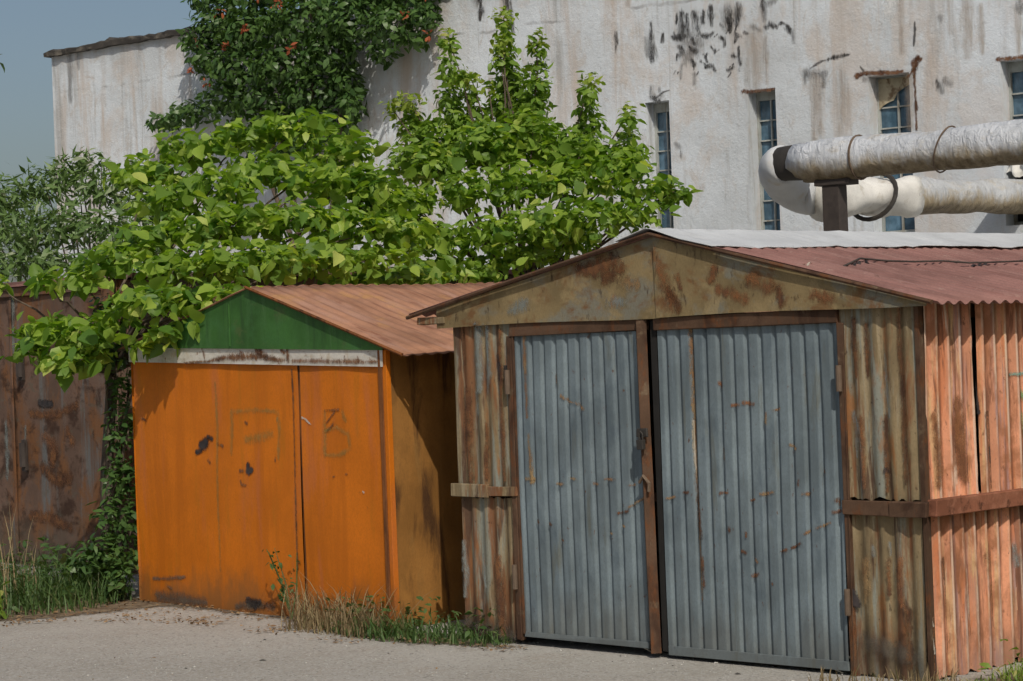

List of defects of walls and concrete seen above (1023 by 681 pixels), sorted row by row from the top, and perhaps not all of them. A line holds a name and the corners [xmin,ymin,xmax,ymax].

rust [708,265,785,306]
rust [464,387,489,484]
rust [497,329,507,481]
rust [667,329,705,600]
rust [931,413,944,488]
rust [954,396,968,483]
rust [465,554,517,641]